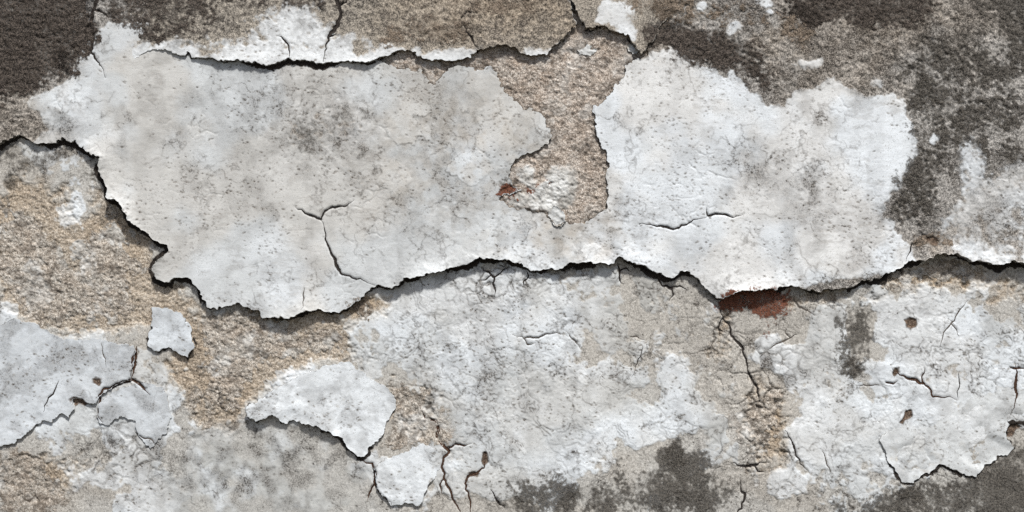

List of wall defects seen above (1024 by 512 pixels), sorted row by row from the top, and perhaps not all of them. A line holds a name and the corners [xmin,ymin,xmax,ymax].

water stain [0,0,102,109]
crack [186,0,484,72]
flaking render [0,0,1024,320]
rust [496,180,551,203]
water stain [627,0,1024,224]
spalling [0,197,172,512]
flaking render [147,307,195,357]
spalling [187,310,345,430]
crack [0,135,1024,420]
rust [714,287,791,338]
crack [419,403,505,512]
water stain [486,436,739,512]